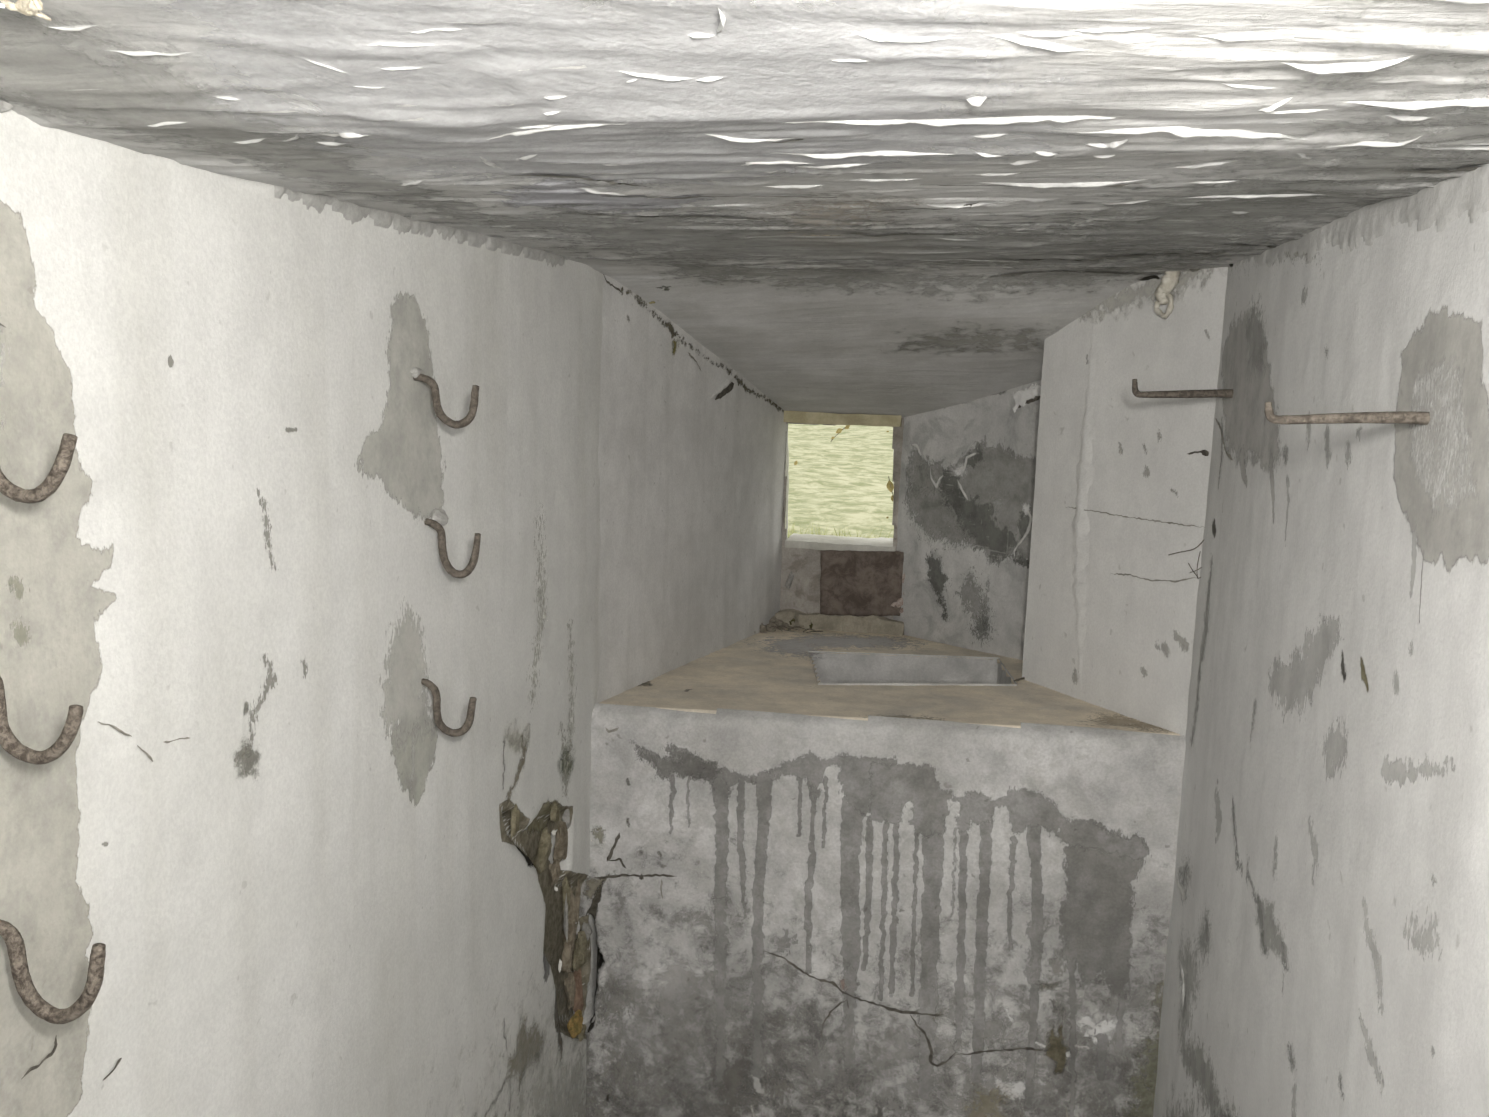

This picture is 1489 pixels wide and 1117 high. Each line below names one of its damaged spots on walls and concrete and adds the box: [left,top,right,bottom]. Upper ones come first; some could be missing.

peeling [688,5,726,38]
peeling [1013,384,1041,413]
damp [925,549,996,647]
spalling [485,800,610,1117]
damp [519,741,1160,1117]
crack [764,951,1042,1067]